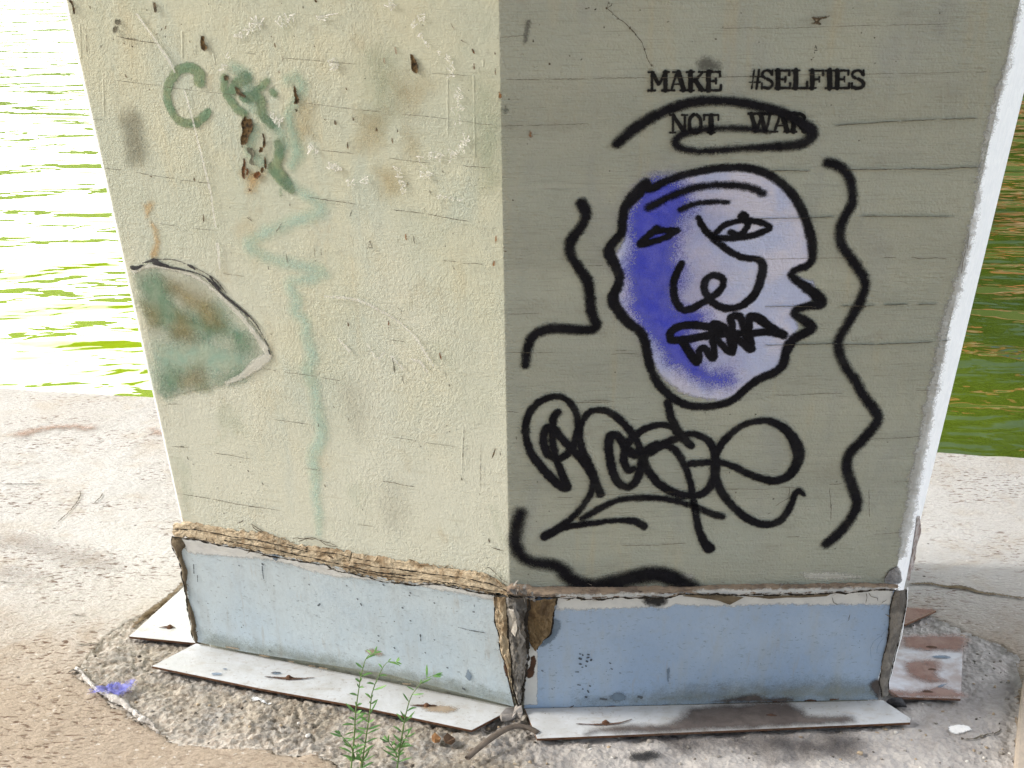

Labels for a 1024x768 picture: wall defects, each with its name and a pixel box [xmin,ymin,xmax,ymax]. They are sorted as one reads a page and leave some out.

peeling [683,594,830,605]
peeling [508,609,517,636]